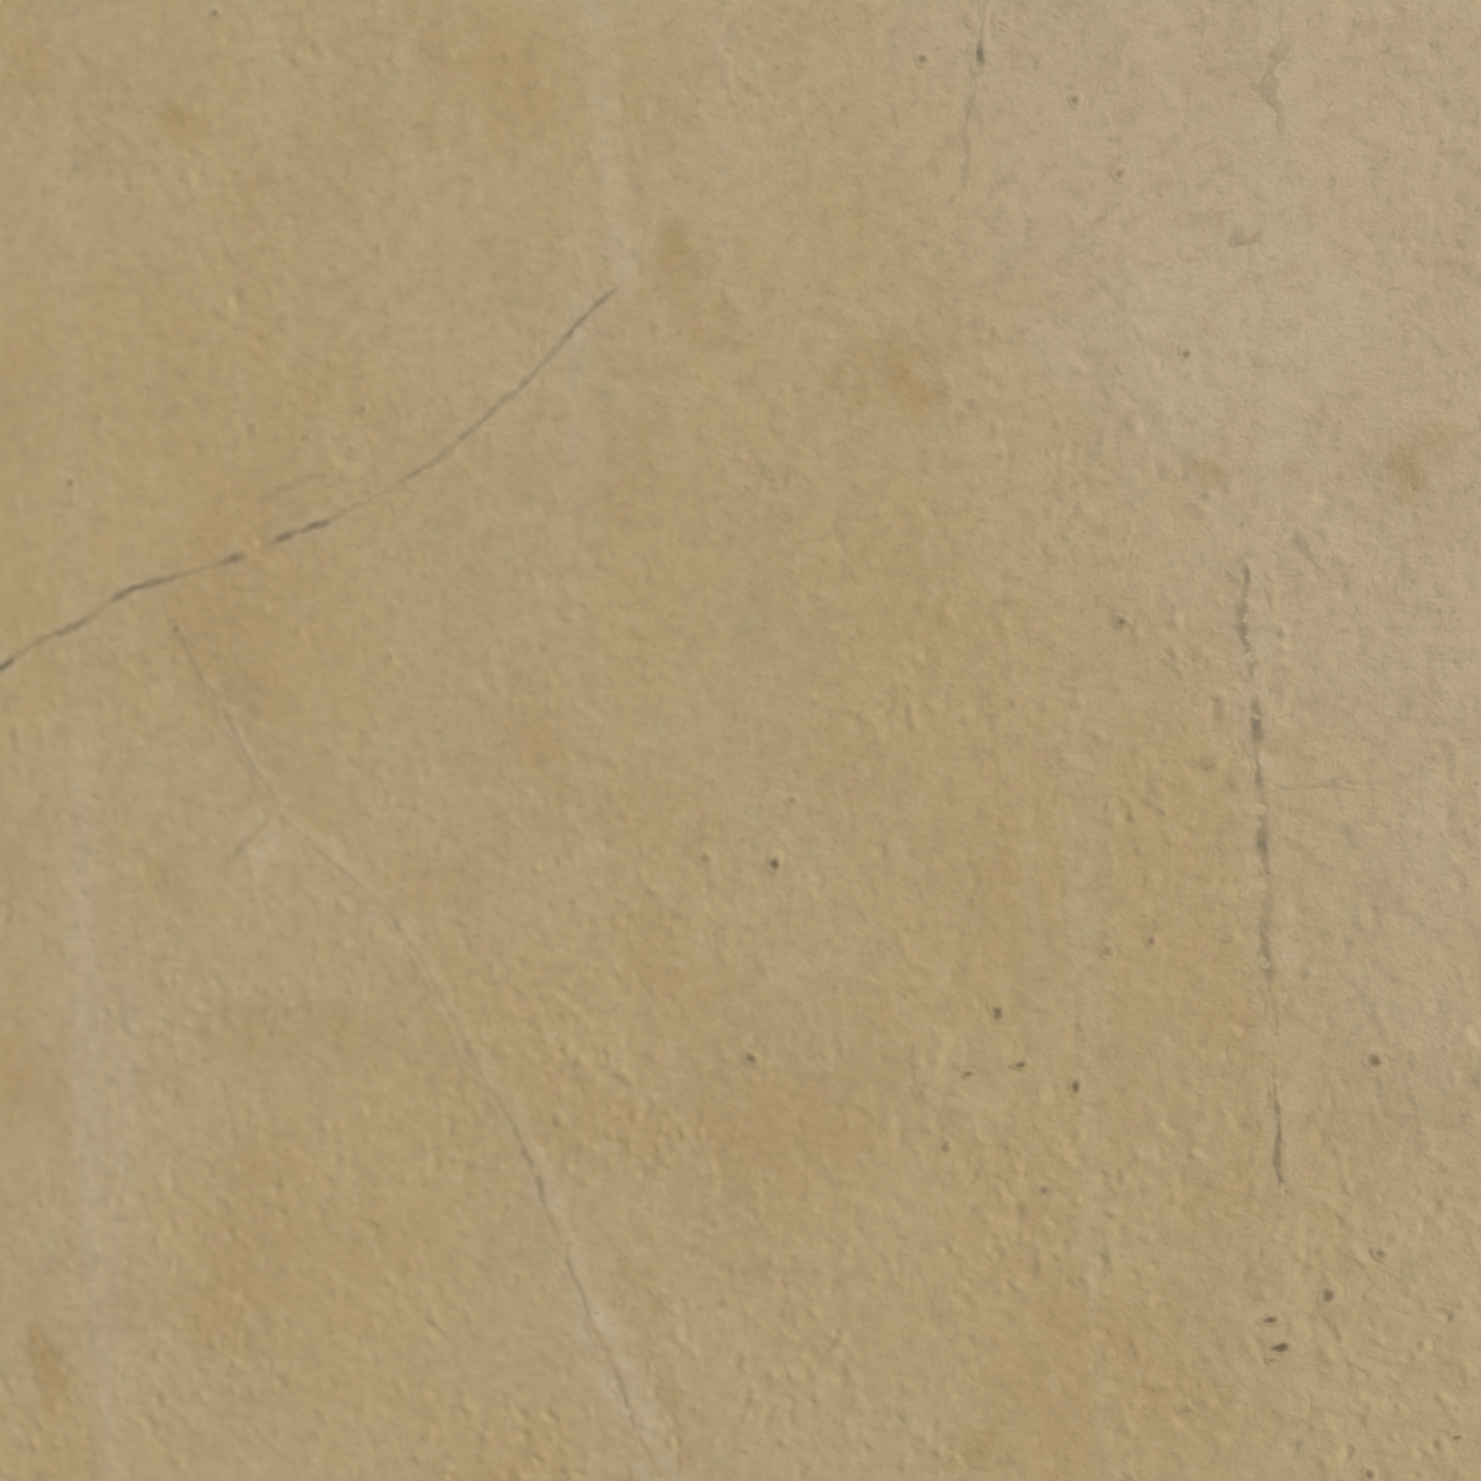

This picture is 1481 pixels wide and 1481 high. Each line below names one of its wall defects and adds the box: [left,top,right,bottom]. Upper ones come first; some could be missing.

crack [958,0,1015,189]
crack [0,283,621,684]